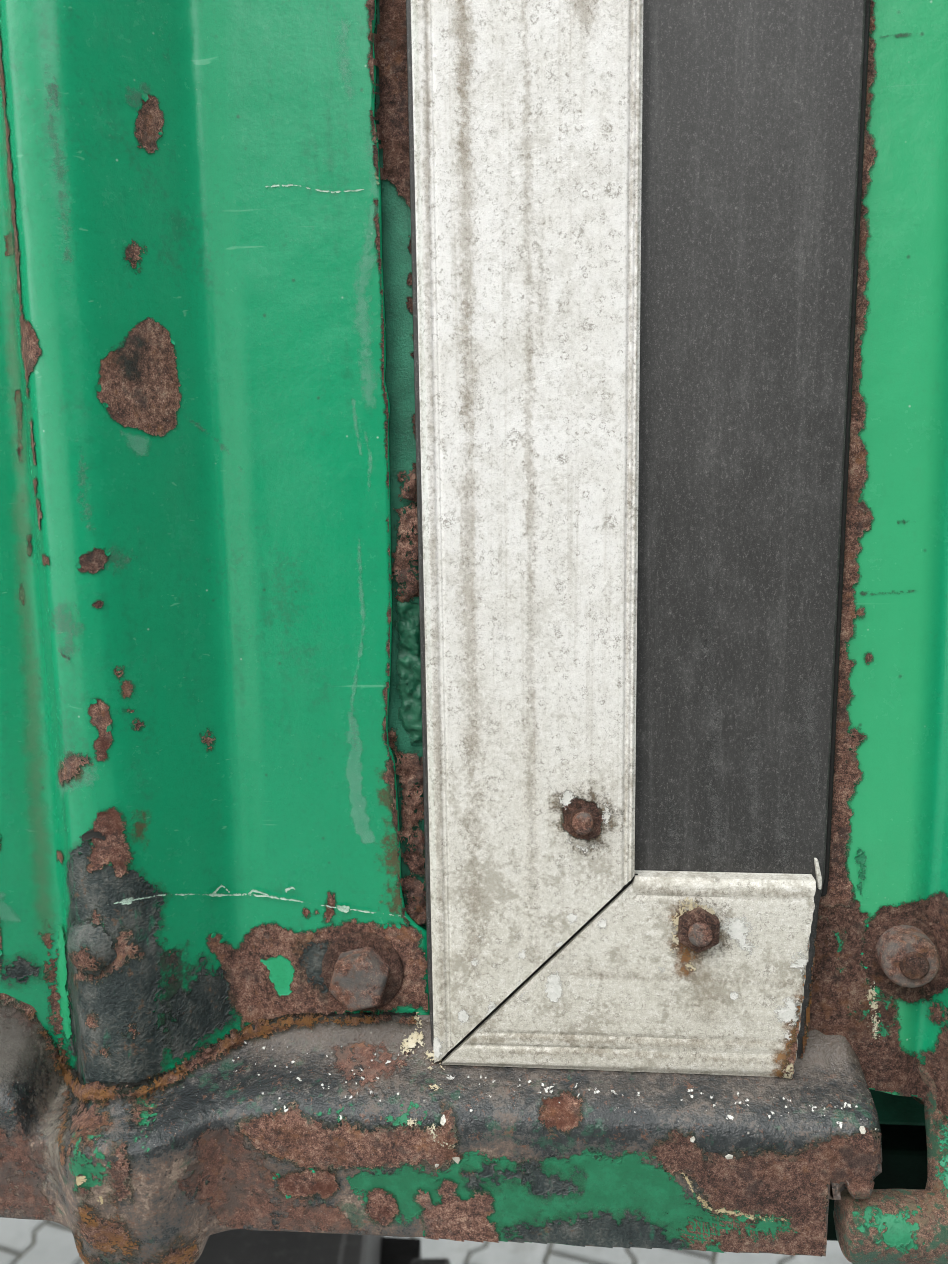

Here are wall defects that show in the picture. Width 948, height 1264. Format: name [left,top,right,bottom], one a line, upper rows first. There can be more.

corrosion [365,0,410,207]
corrosion [0,40,49,565]
corrosion [773,1,948,1132]
corrosion [0,199,428,1264]
corrosion [549,787,623,859]
corrosion [671,898,730,976]
corrosion [177,1101,499,1243]
corrosion [538,1091,583,1132]
corrosion [650,1126,882,1257]